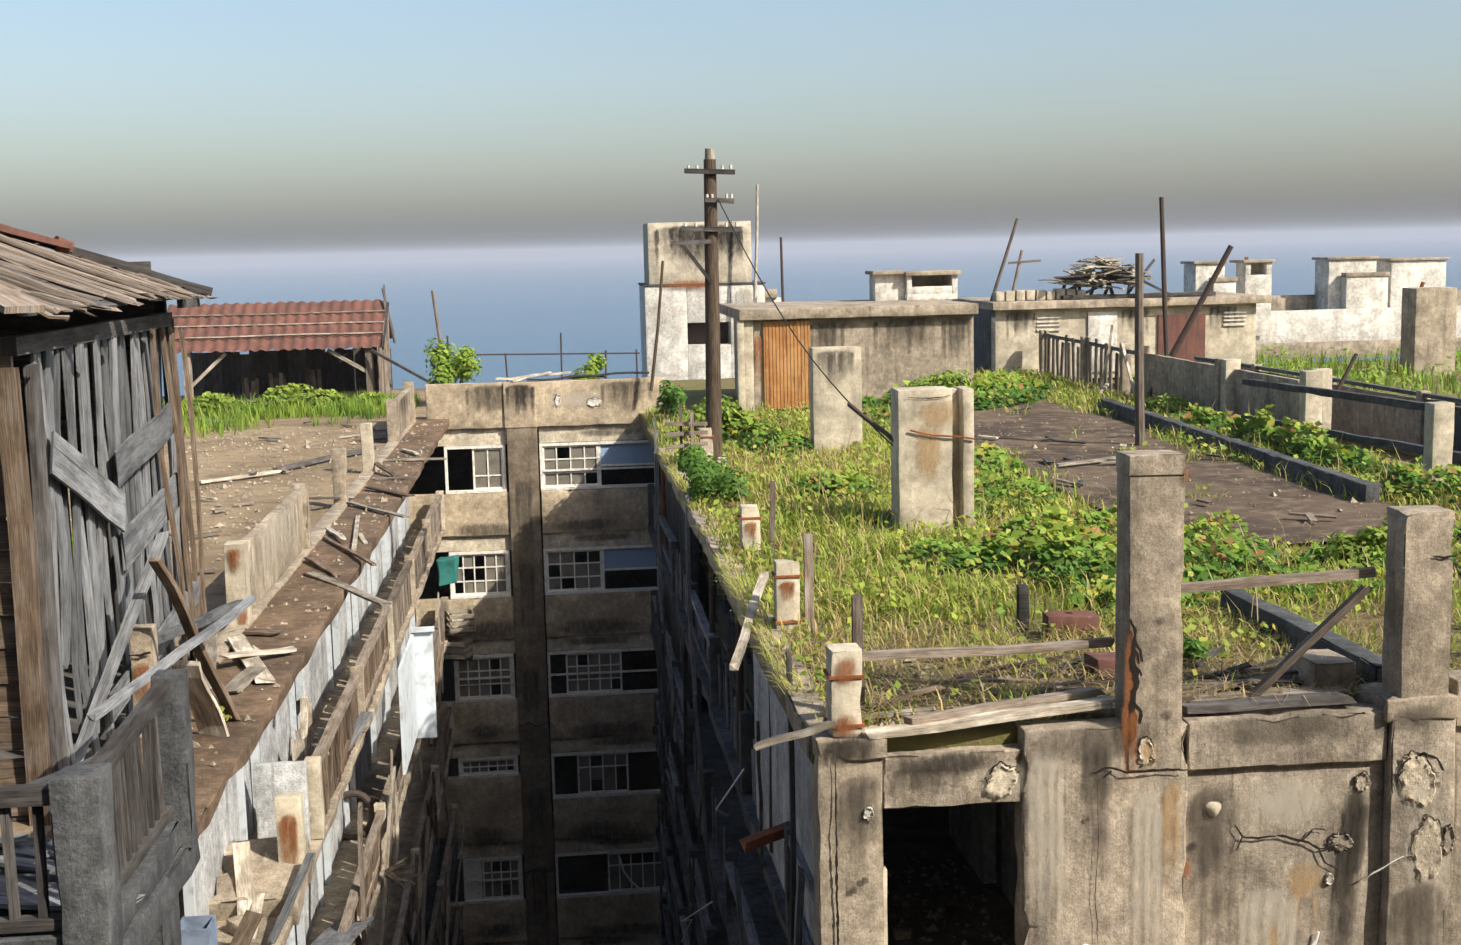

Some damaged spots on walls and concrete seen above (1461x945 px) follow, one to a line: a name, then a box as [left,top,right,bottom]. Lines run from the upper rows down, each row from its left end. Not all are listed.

rust [228,549,239,568]
rust [780,582,794,594]
rust [837,660,854,682]
rust [1122,639,1153,760]
rust [838,717,855,736]
spalling [1137,736,1157,767]
spalling [985,761,1020,798]
crack [1091,619,1188,941]
spalling [1398,750,1455,884]
rust [280,815,298,862]
crack [1235,825,1404,884]